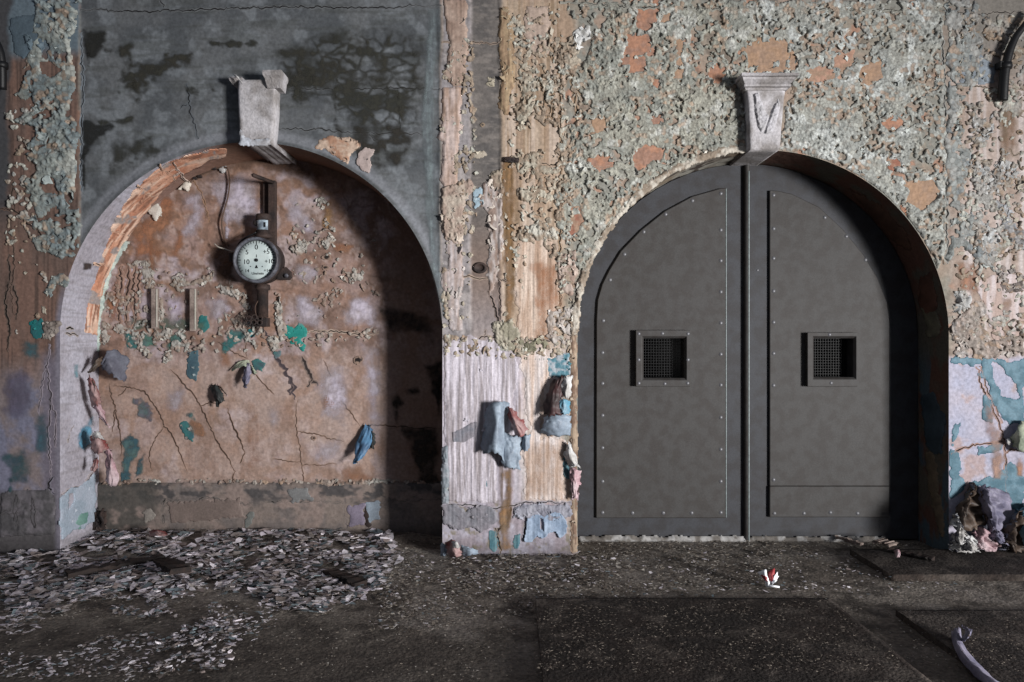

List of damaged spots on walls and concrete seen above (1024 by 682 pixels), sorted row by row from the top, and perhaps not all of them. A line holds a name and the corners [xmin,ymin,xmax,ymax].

peeling [4,0,83,341]
crack [109,384,188,472]
flaking render [0,129,378,539]
leakage [279,15,441,292]
crack [161,240,577,554]
peeling [176,0,1024,558]
crack [951,366,1020,491]